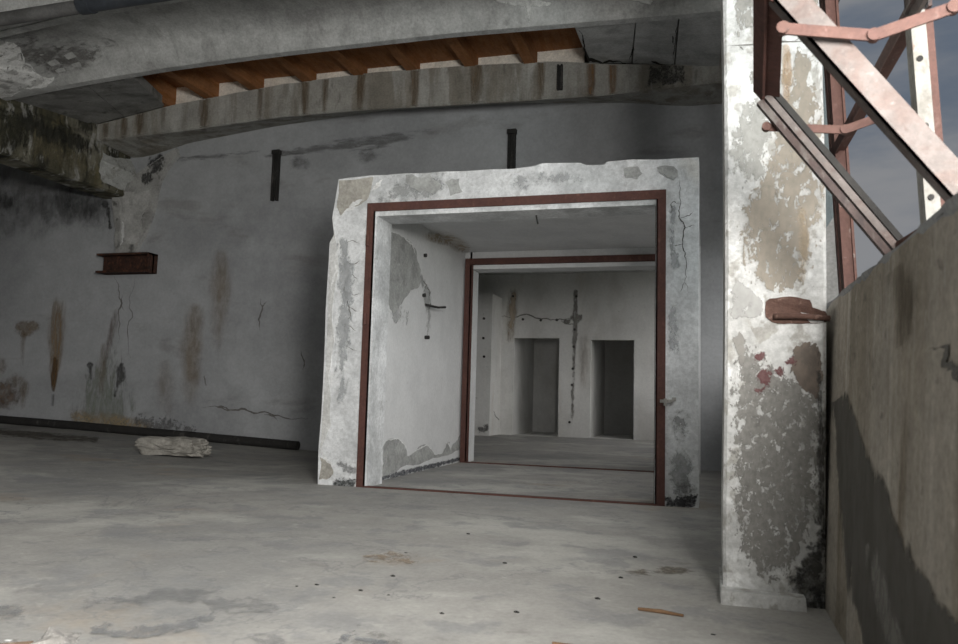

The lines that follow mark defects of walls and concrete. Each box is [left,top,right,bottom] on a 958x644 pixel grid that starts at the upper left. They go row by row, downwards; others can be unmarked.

peeling [734,0,753,36]
peeling [0,39,54,98]
peeling [781,47,823,138]
damp [141,154,164,185]
flaking render [624,166,642,179]
flaking render [657,165,678,181]
crack [670,176,693,290]
peeling [729,97,825,319]
flaking render [389,232,421,313]
corrosion [50,308,62,398]
crack [203,377,304,421]
flaking render [382,436,460,477]